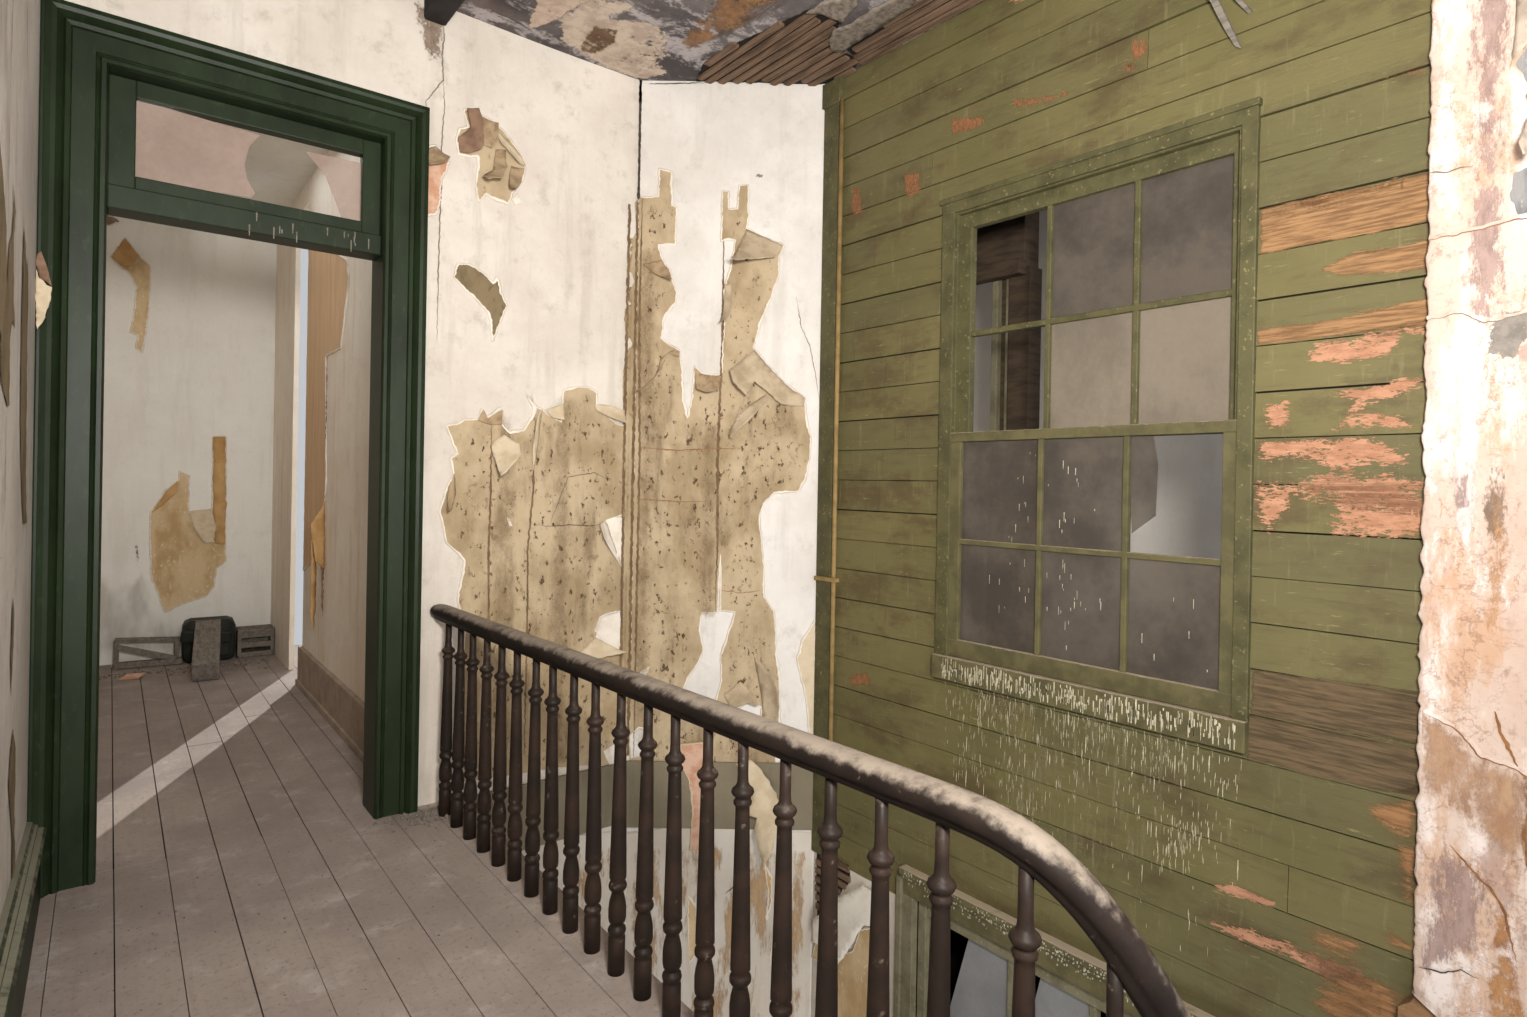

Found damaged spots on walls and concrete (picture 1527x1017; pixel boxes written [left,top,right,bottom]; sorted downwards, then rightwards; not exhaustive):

peeling [428,108,526,217]
peeling [1258,172,1429,276]
crack [1428,165,1473,173]
crack [1429,214,1527,240]
flaking render [0,145,52,524]
peeling [135,435,227,613]
flaking render [439,168,812,723]
peeling [1254,377,1426,539]
flaking render [463,631,775,851]
water stain [941,658,1242,882]
crack [1423,709,1527,868]
crack [1451,846,1517,963]